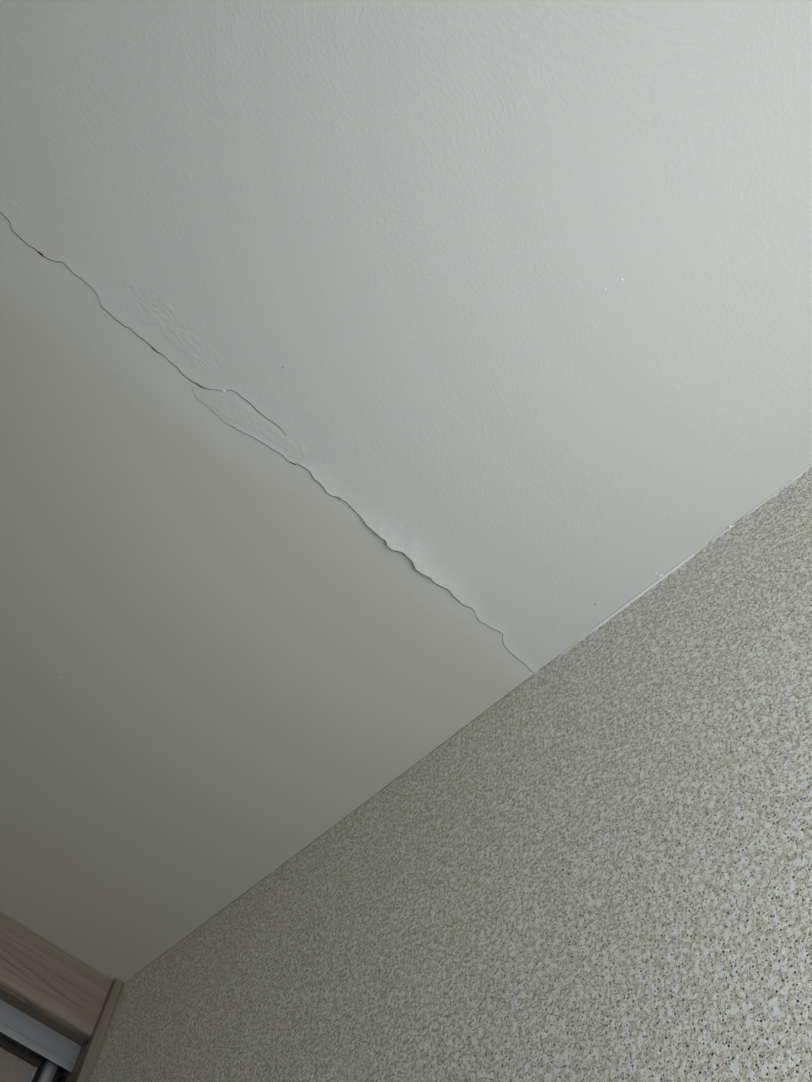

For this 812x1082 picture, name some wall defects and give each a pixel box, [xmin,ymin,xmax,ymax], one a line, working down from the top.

peeling [296,452,539,673]